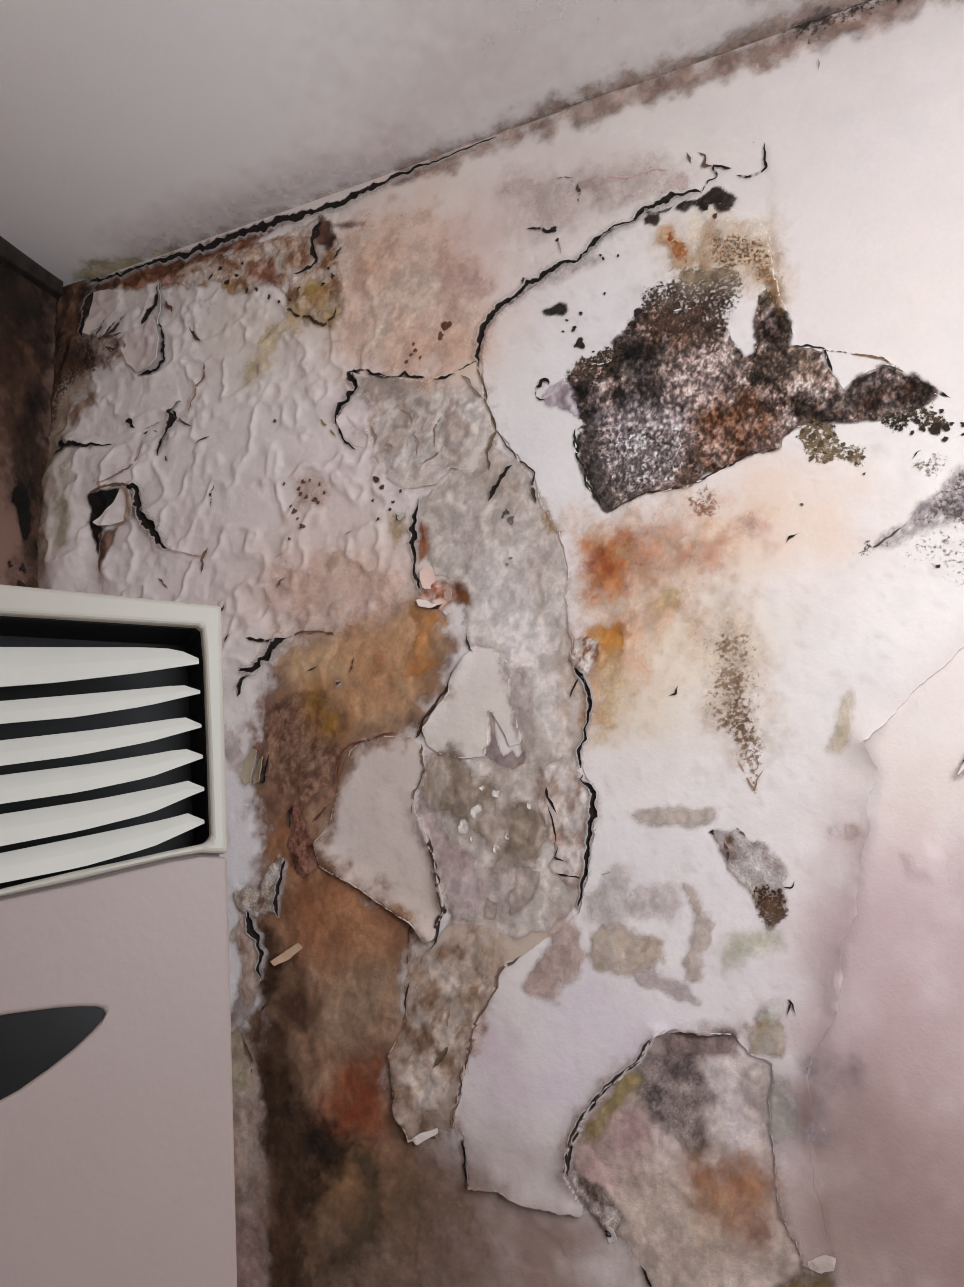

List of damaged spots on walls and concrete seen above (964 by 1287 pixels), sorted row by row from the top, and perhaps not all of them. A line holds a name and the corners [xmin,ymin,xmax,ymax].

damp [398,0,918,175]
crack [88,137,496,290]
flaking render [76,215,355,375]
damp [0,246,180,588]
damp [535,264,964,587]
flaking render [224,729,269,785]
peeling [313,202,964,1287]
flaking render [230,855,303,1006]
damp [231,979,273,1287]
damp [759,1070,797,1143]
damp [781,1273,833,1287]